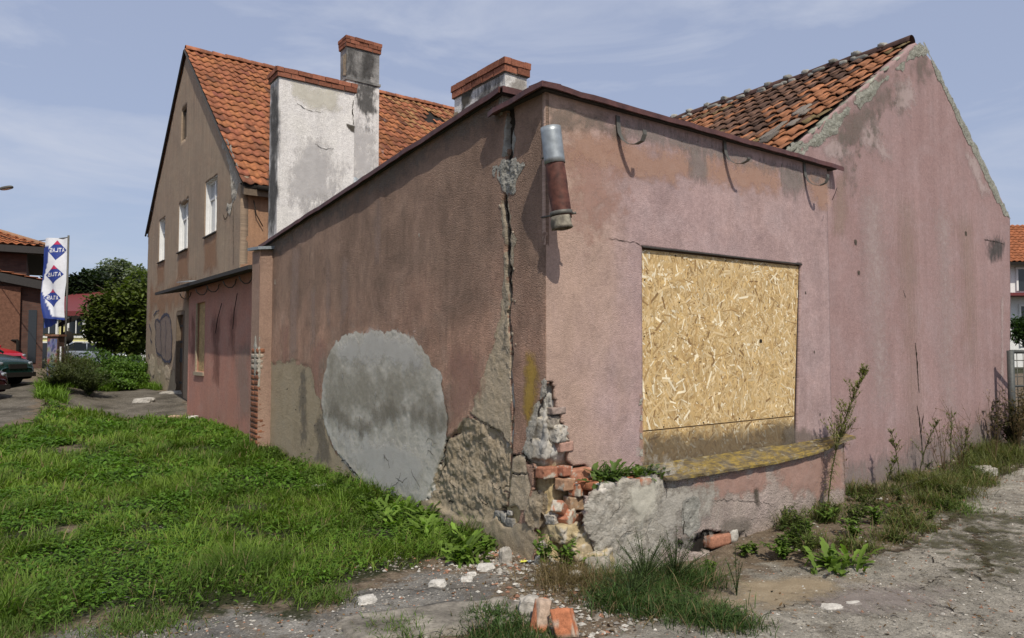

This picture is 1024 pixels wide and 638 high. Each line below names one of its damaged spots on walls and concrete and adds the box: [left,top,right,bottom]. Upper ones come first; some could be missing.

crack [502,109,516,160]
corrosion [546,134,692,227]
flaking render [786,42,1011,219]
crack [499,195,517,379]
leakage [523,354,537,420]
spalling [430,299,615,573]
peeling [666,449,843,537]